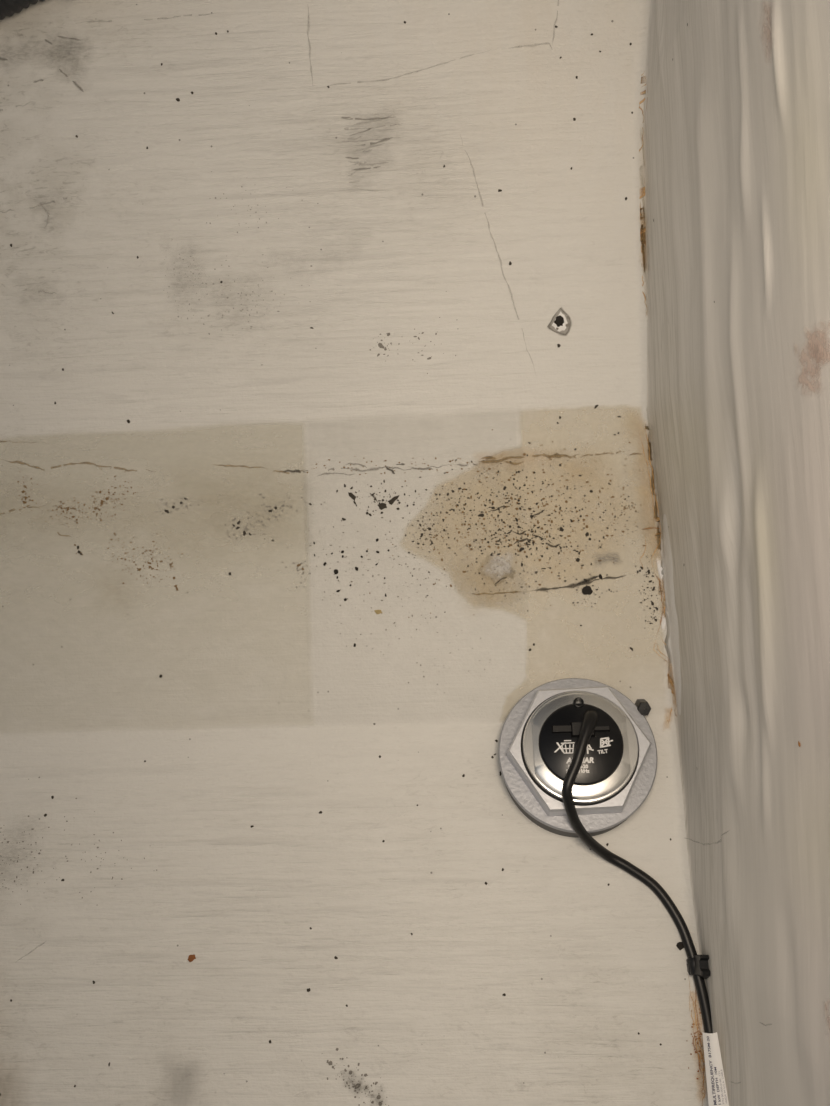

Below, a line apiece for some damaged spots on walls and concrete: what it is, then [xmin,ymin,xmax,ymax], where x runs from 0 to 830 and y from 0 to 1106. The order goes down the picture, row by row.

crack [0,441,156,472]
crack [213,448,637,475]
damp [217,494,306,546]
damp [278,443,646,619]
corrosion [686,982,705,1104]